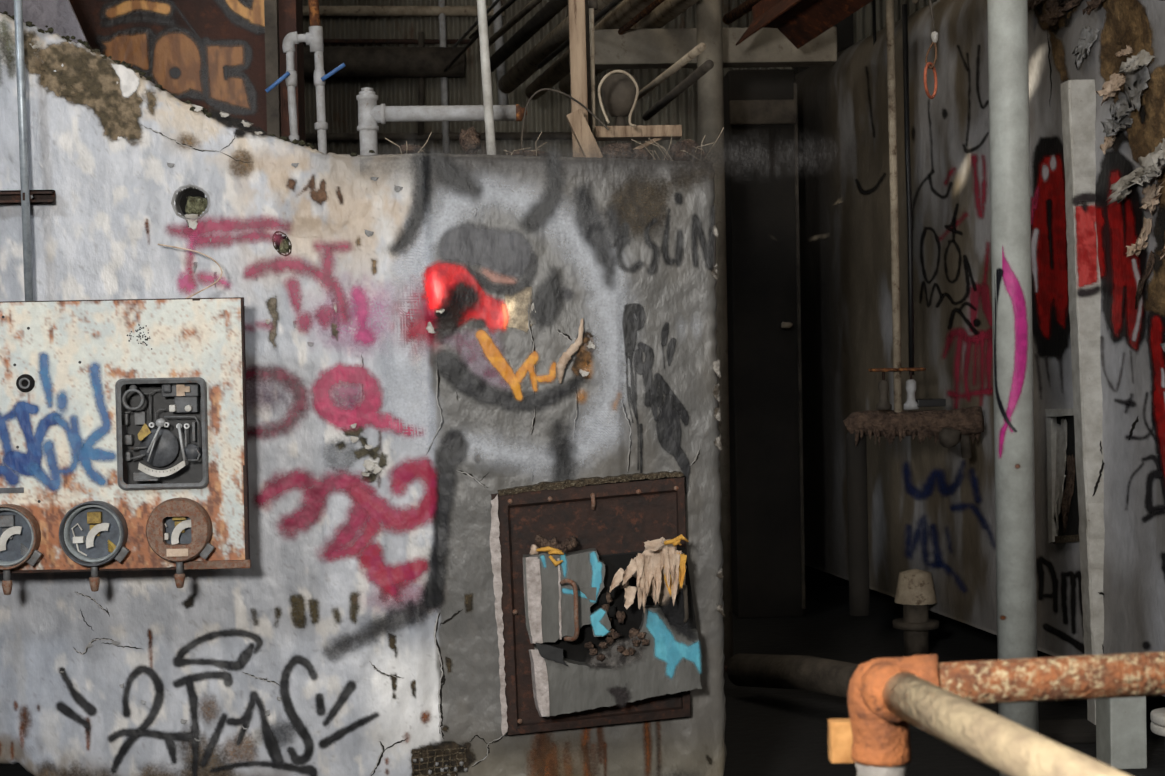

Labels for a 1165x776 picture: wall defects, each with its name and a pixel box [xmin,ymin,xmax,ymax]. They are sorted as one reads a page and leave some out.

flaking render [24,31,156,145]
crack [142,125,254,163]
peeling [1028,0,1165,316]
peeling [557,318,595,383]
flaking render [337,424,387,483]
flaking render [411,726,476,776]
corrosion [581,726,607,776]
corrosion [644,721,660,776]